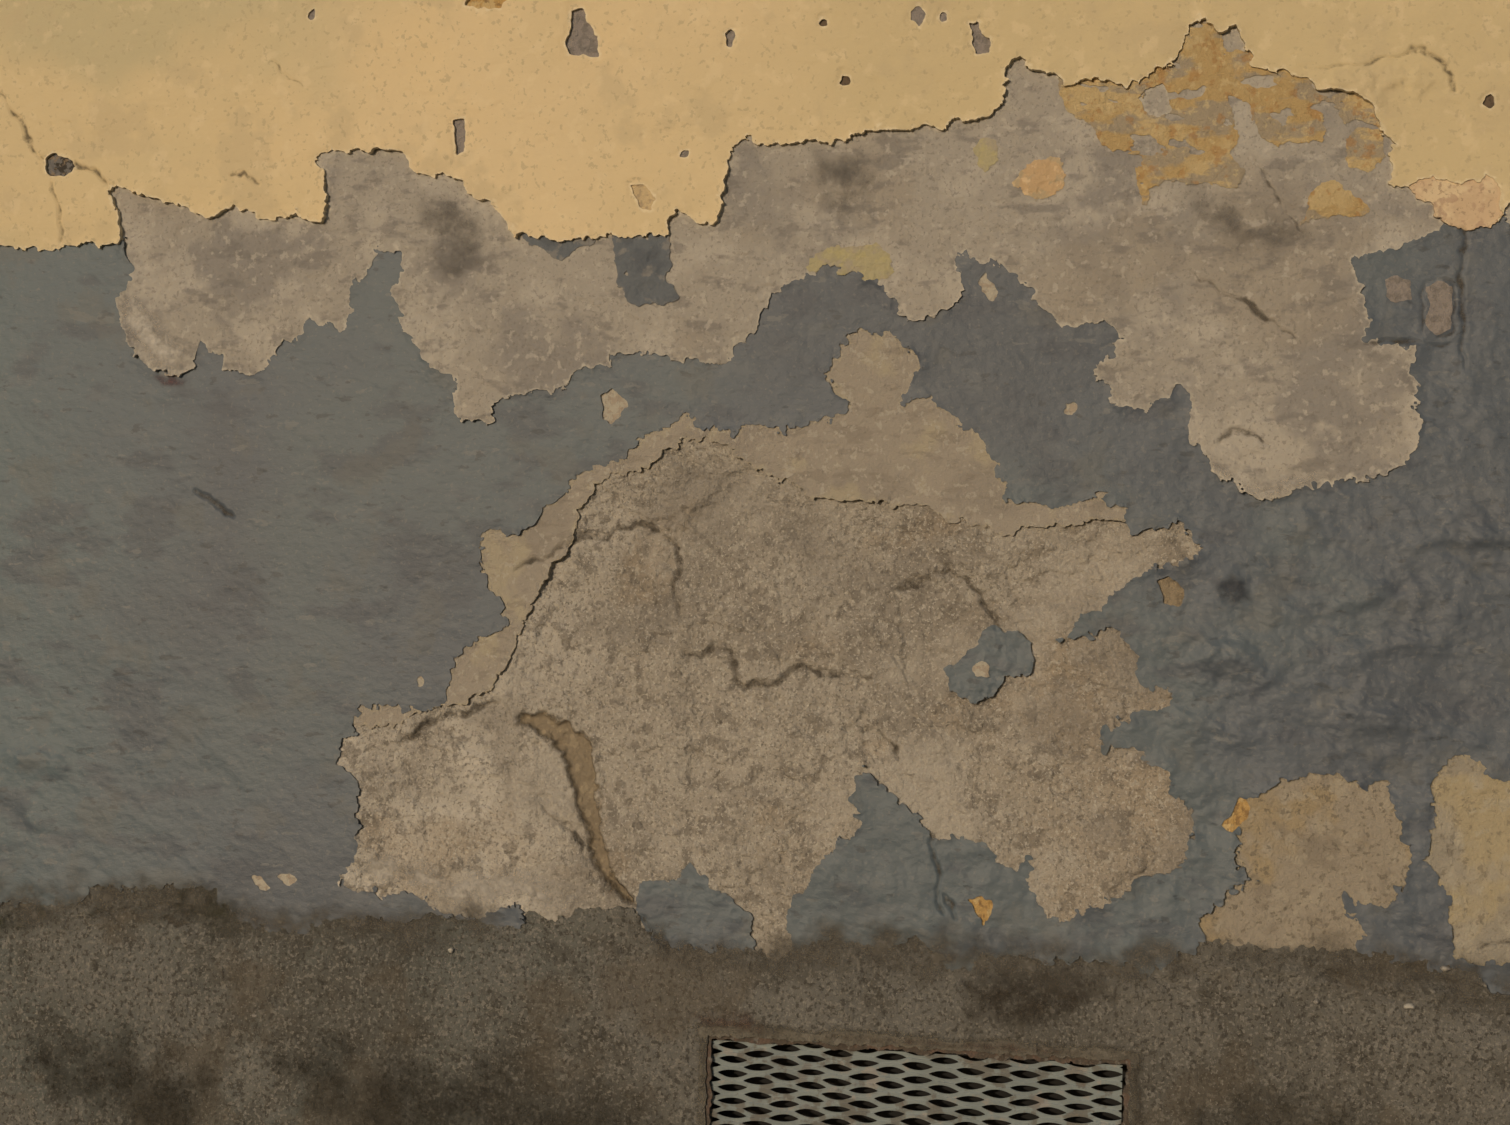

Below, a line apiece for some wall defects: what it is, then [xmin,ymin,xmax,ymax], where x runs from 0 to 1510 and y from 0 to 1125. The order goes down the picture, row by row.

flaking render [110,20,1510,966]
crack [575,524,681,586]
crack [908,570,996,621]
crack [698,648,837,688]